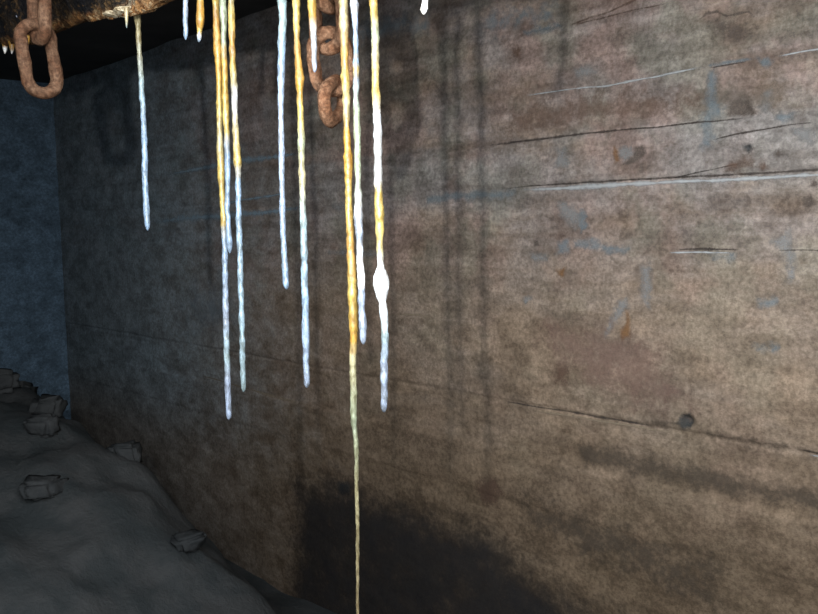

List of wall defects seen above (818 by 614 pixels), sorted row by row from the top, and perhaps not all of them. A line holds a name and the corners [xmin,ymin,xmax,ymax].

crack [504,119,803,144]
water stain [175,154,292,174]
crack [523,165,818,190]
water stain [163,194,296,223]
crack [511,402,663,432]